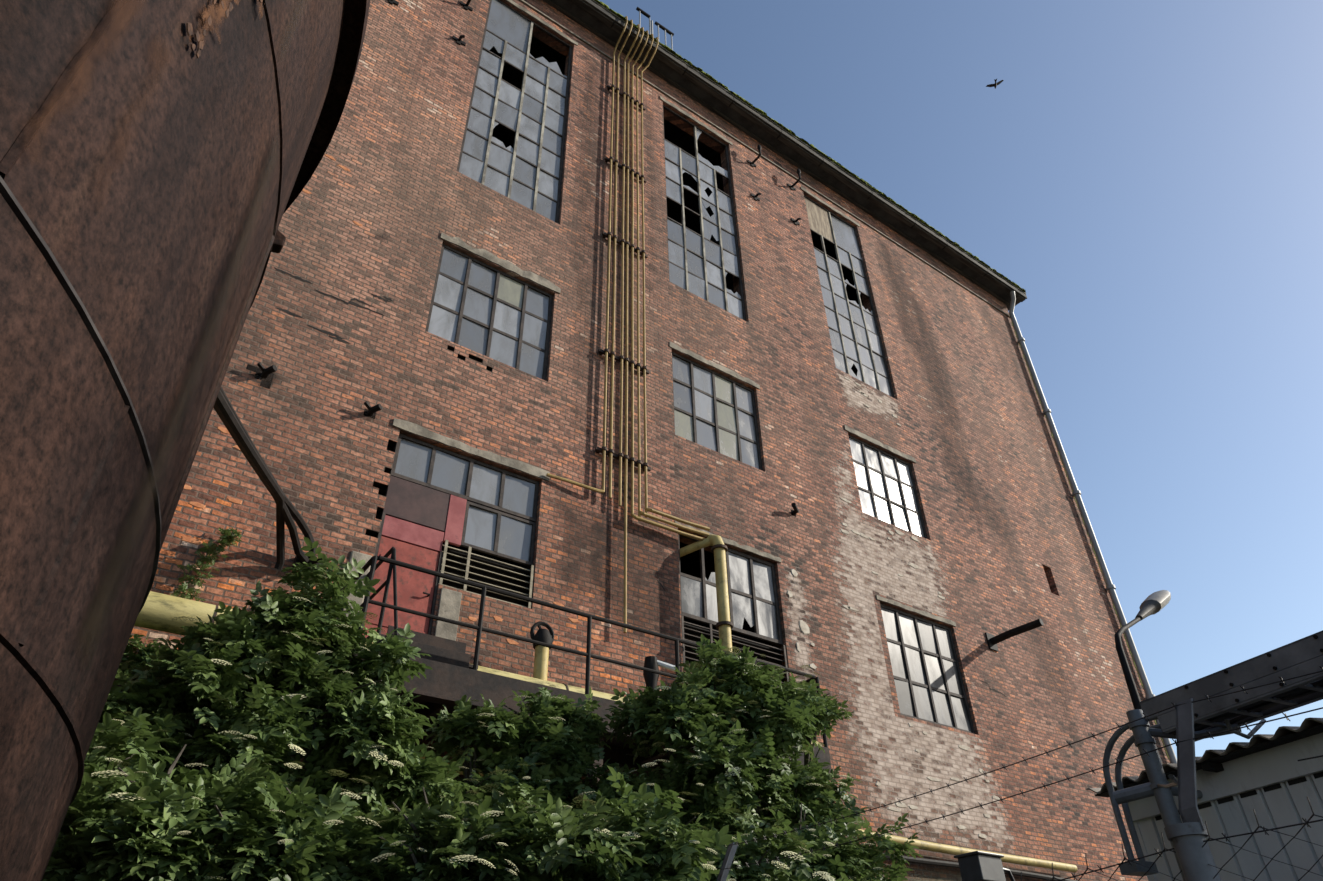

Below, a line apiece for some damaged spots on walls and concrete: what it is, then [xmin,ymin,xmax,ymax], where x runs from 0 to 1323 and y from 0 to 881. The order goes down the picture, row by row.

rust [186,0,239,58]
peeling [786,568,817,685]
peeling [831,443,1013,852]